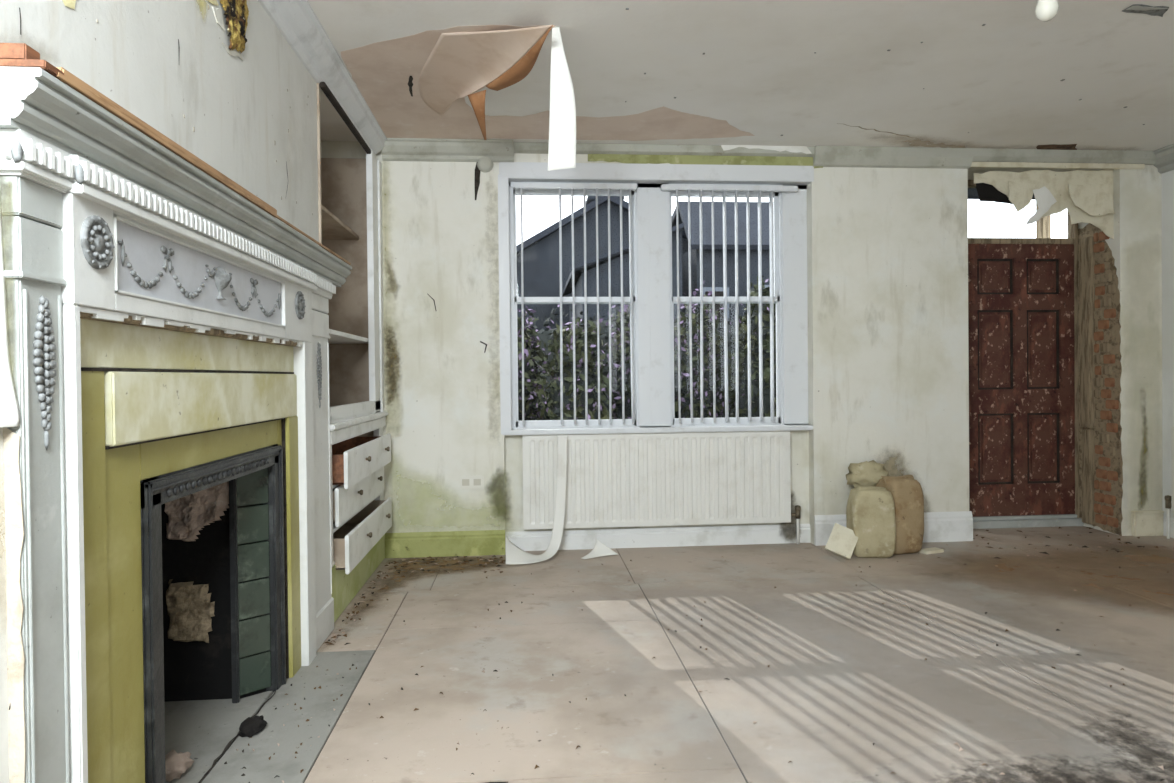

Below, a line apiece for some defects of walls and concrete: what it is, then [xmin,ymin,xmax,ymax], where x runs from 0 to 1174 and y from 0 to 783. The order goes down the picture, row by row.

spalling [207,0,249,61]